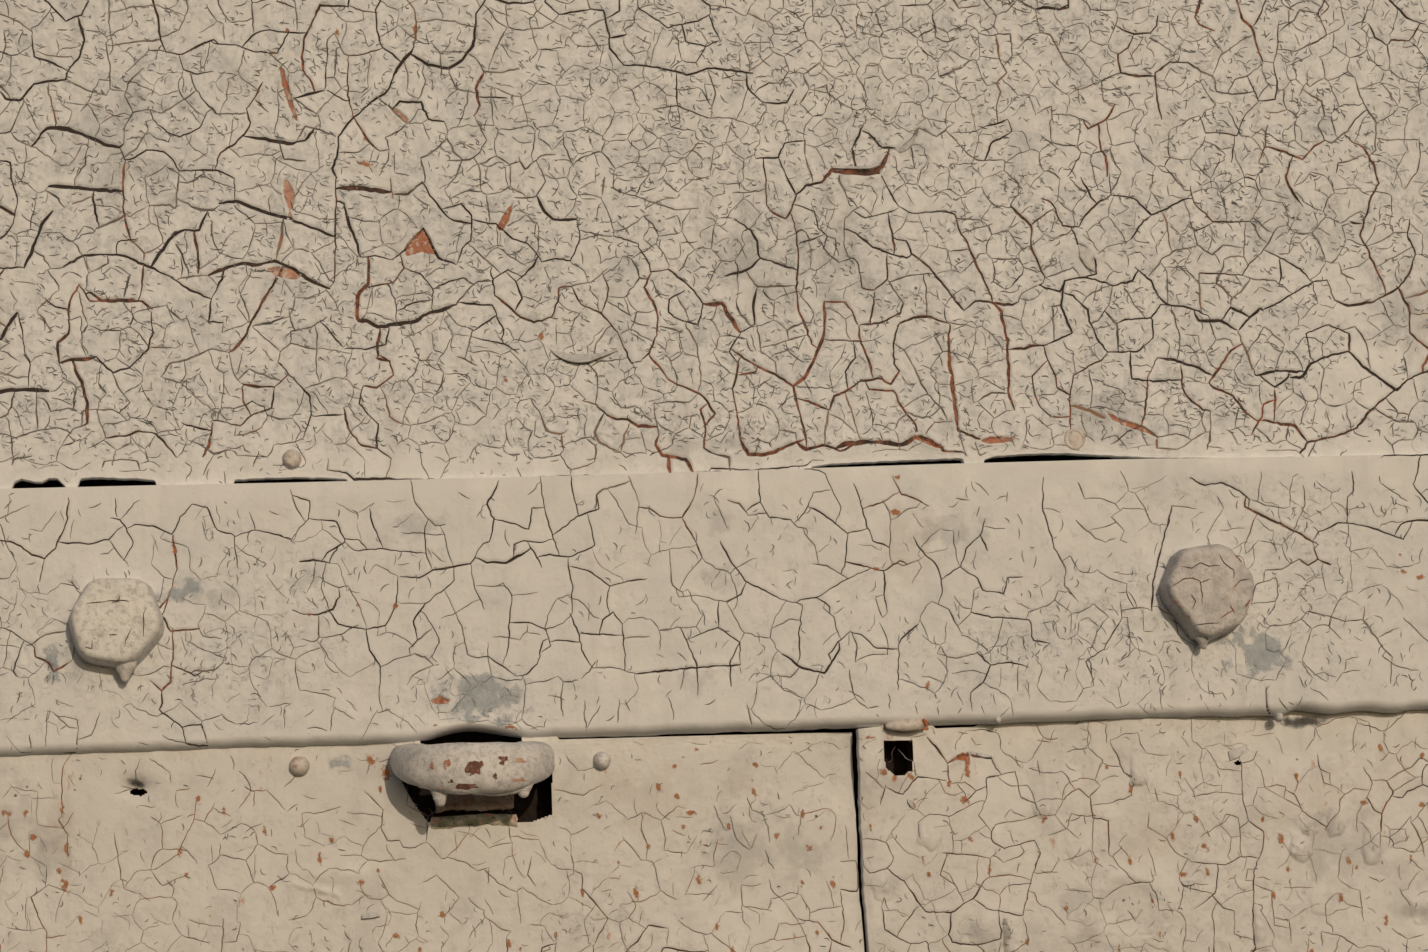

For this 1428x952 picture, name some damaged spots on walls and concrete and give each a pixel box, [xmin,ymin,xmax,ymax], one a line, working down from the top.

peeling [405,229,434,256]